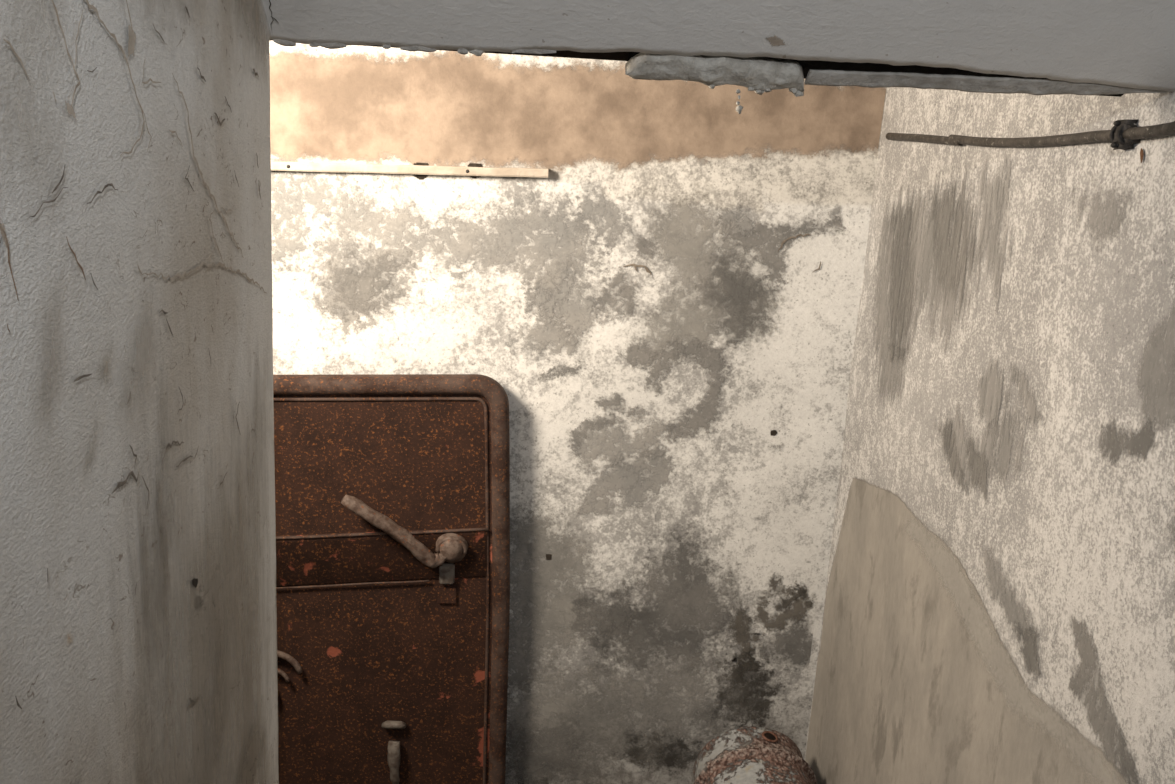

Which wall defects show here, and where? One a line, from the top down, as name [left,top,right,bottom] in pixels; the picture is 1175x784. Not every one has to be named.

spalling [625,36,1168,97]
crack [0,0,266,333]
water stain [637,191,777,363]
water stain [875,161,1011,399]
water stain [1074,191,1130,243]
water stain [937,360,1041,500]
water stain [1099,307,1175,464]
water stain [505,505,813,784]